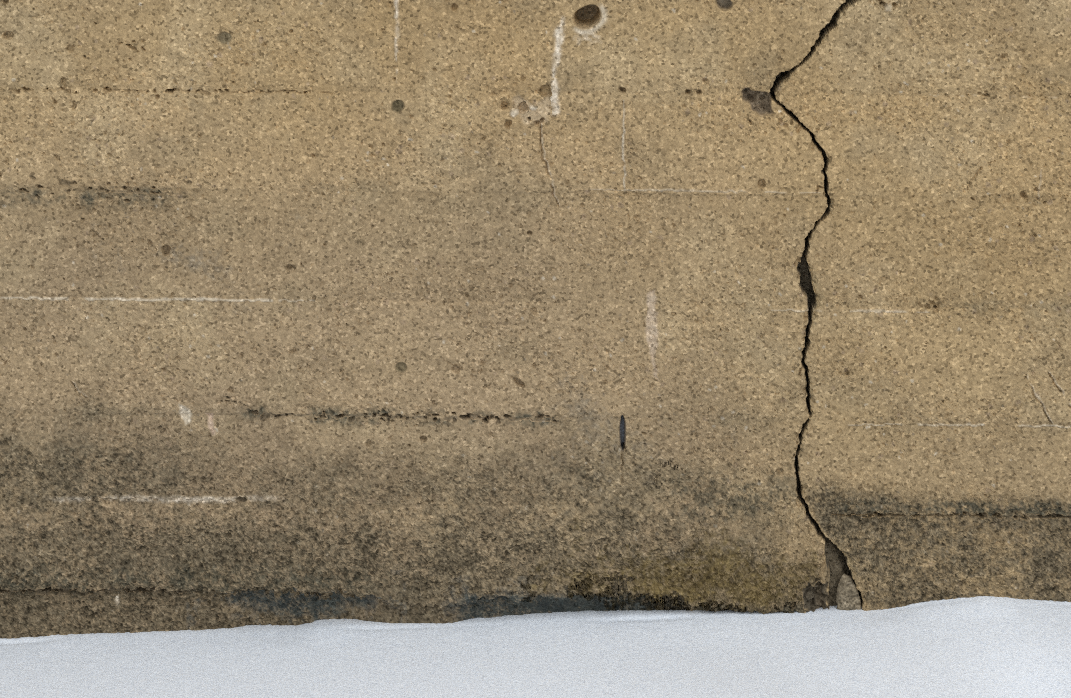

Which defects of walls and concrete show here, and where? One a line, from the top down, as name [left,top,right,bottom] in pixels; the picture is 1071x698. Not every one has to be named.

crack [966,160,996,191]
crack [771,0,915,608]
crack [1024,371,1071,425]